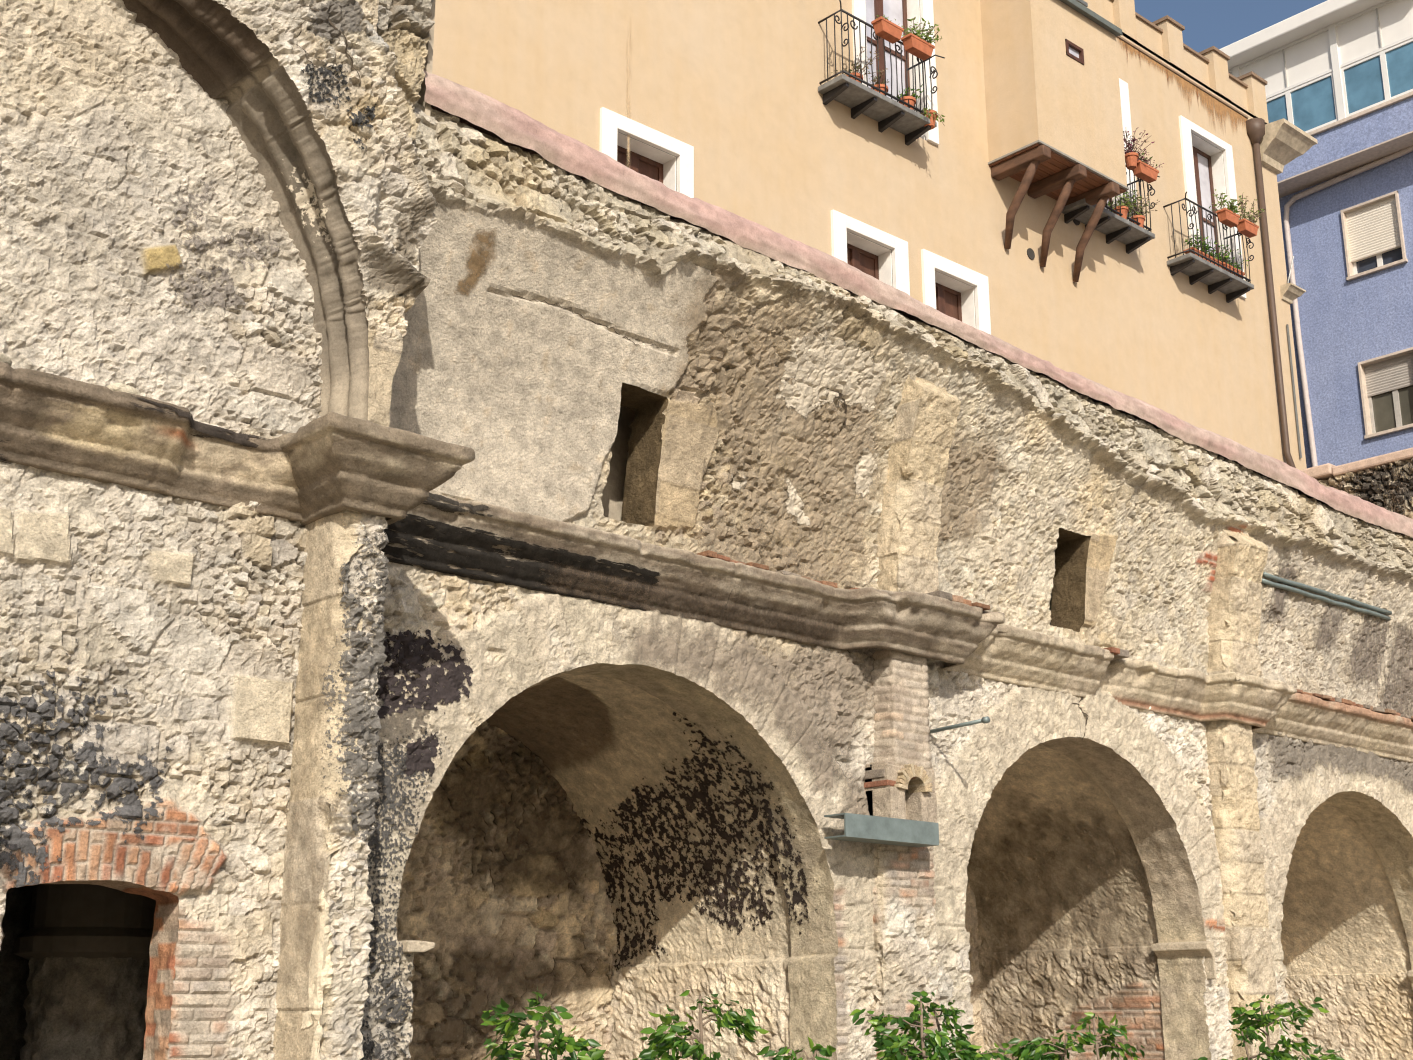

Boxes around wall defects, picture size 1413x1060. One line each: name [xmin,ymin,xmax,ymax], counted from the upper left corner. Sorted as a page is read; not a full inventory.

leakage [0,639,175,887]
leakage [320,526,610,1060]
leakage [694,723,817,935]